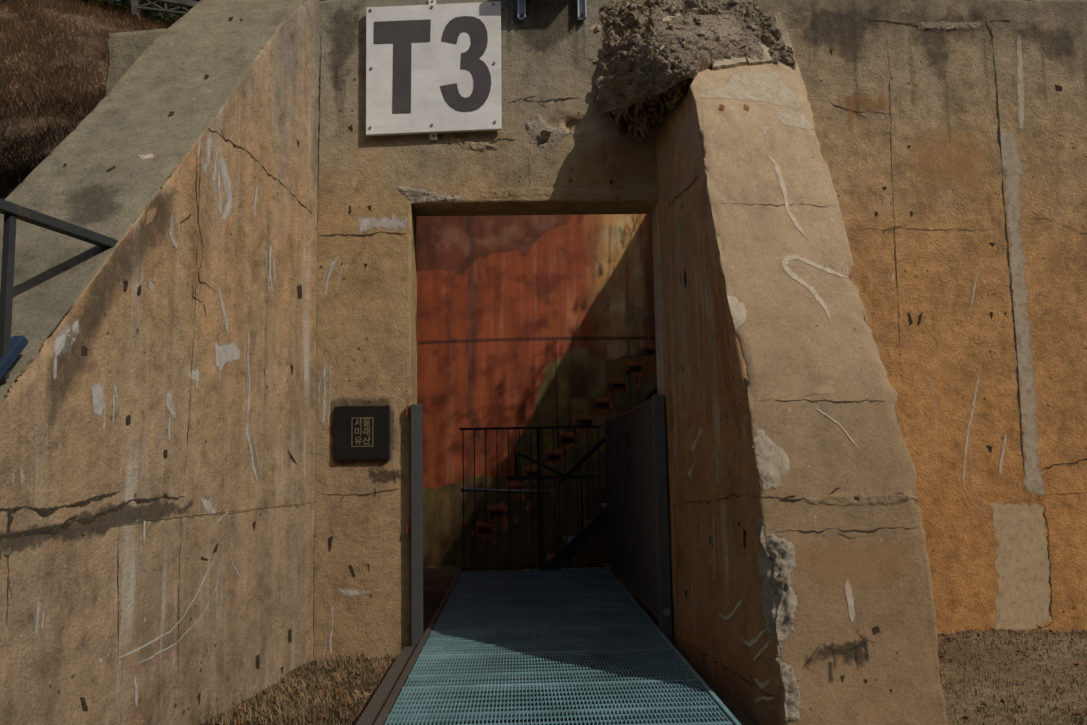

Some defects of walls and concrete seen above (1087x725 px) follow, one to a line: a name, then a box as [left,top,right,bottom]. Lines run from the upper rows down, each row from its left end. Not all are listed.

crack [509,96,581,107]
spalling [589,0,814,142]
peeling [359,214,408,232]
crack [0,32,407,681]
crack [828,18,1087,631]
peeling [990,34,1052,631]
spalling [752,429,790,491]
spalling [0,498,215,558]
crack [670,487,904,508]
crack [786,526,919,538]
spalling [757,517,801,723]